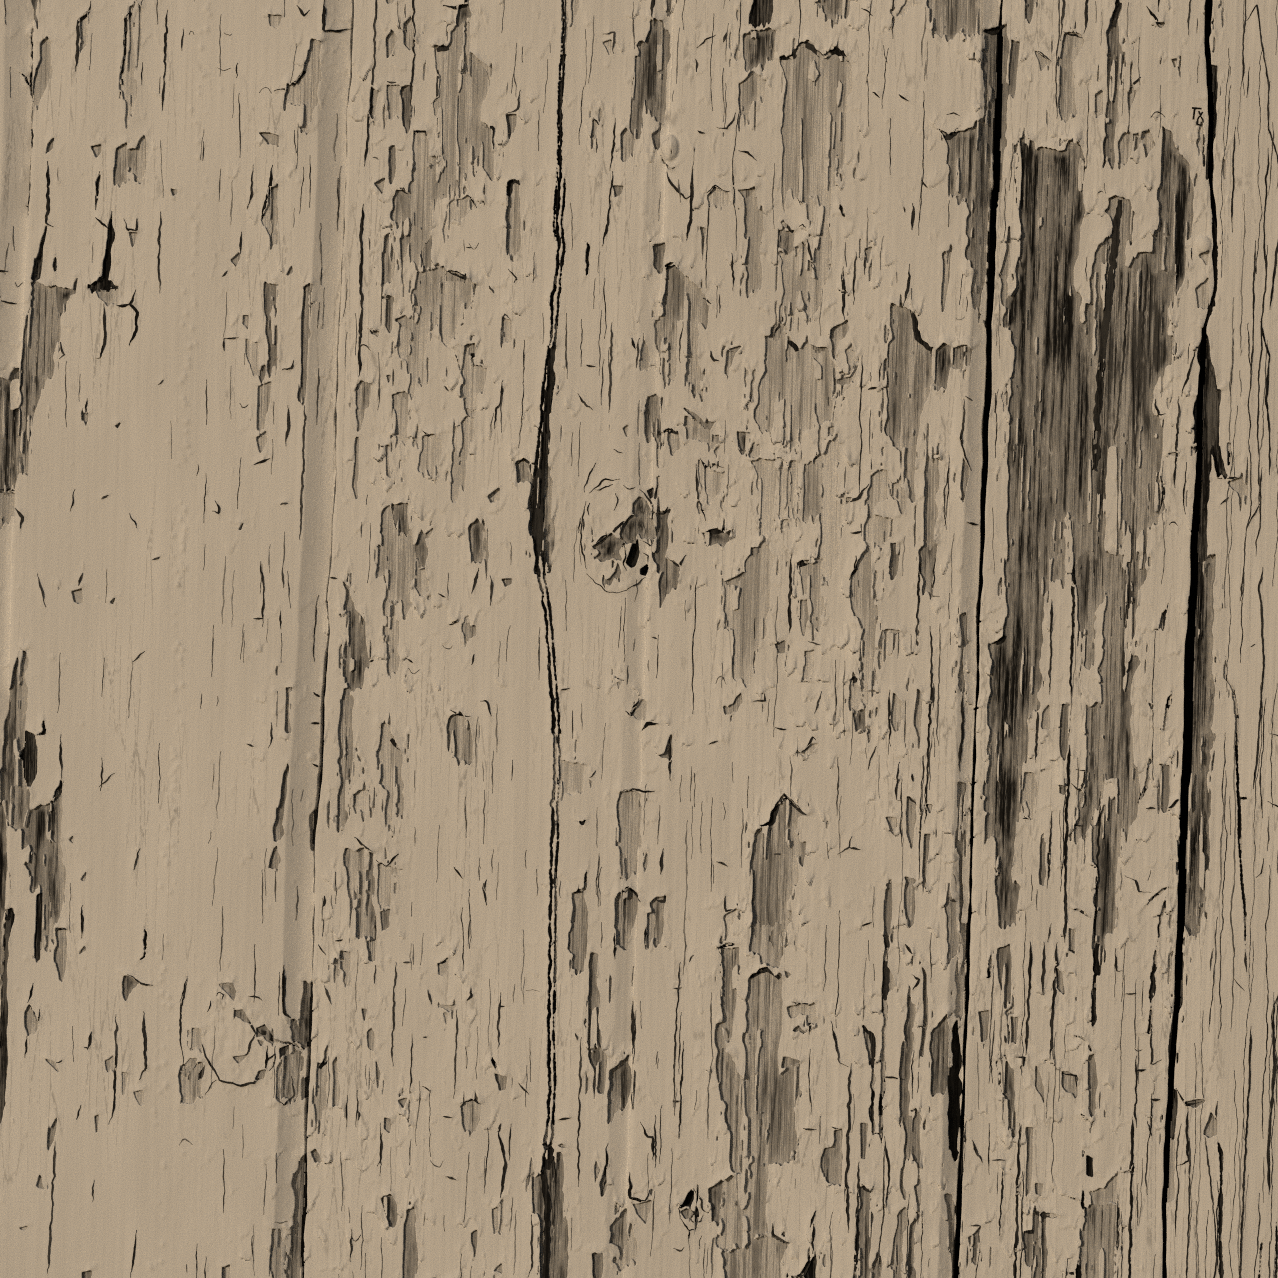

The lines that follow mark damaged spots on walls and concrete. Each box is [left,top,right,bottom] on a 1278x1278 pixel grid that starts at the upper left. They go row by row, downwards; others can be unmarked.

crack [0,0,58,304]
crack [34,655,63,802]
peeling [0,214,137,529]
crack [59,140,163,427]
crack [70,0,467,718]
peeling [309,0,525,962]
crack [179,0,998,1278]
peeling [623,237,736,608]
peeling [693,0,981,761]
peeling [821,0,1248,1278]
crack [56,929,164,1125]
peeling [695,790,829,1278]